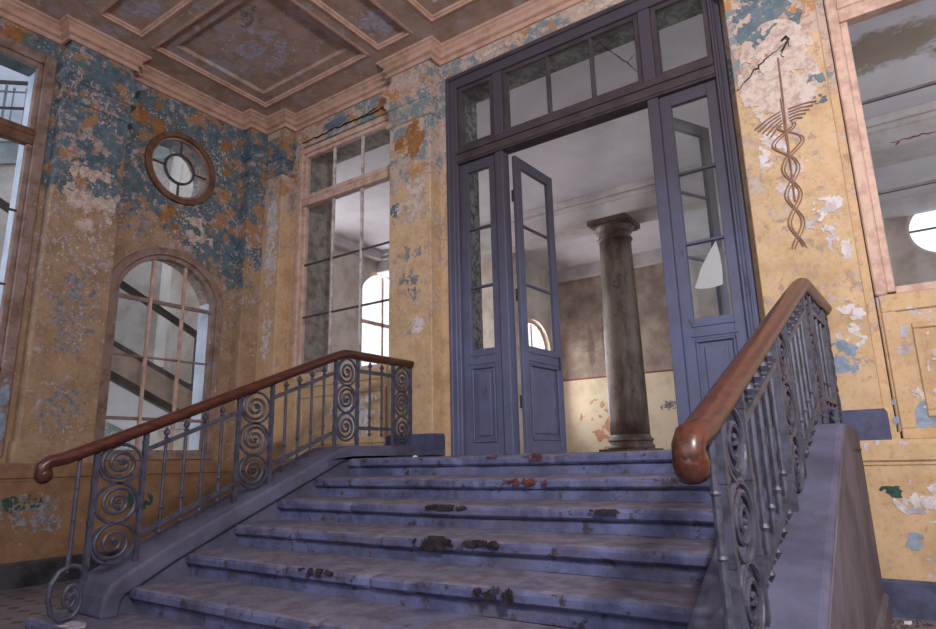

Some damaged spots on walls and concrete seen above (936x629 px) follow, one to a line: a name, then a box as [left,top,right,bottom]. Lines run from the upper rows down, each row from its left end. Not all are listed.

crack [736,42,789,91]
peeling [732,0,828,199]
crack [302,106,386,144]
peeling [394,120,425,158]
peeling [62,161,217,252]
peeling [805,195,854,259]
peeling [831,298,869,374]
peeling [911,385,936,428]
peeling [0,492,71,535]
peeling [879,479,936,523]
spalling [411,535,500,552]
spalling [473,586,514,606]